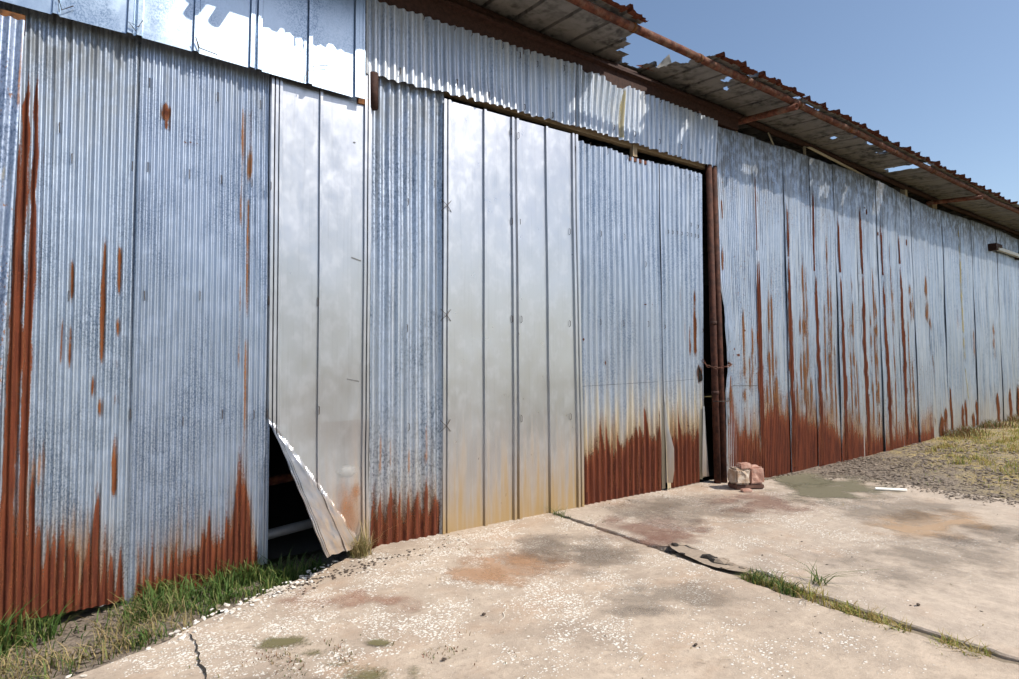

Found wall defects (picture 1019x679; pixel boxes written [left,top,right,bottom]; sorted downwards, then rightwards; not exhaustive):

corrosion [0,47,258,639]
corrosion [728,184,979,478]
corrosion [996,387,1019,422]
corrosion [584,406,700,505]
corrosion [342,487,358,529]
corrosion [370,482,440,549]
crack [187,632,207,679]